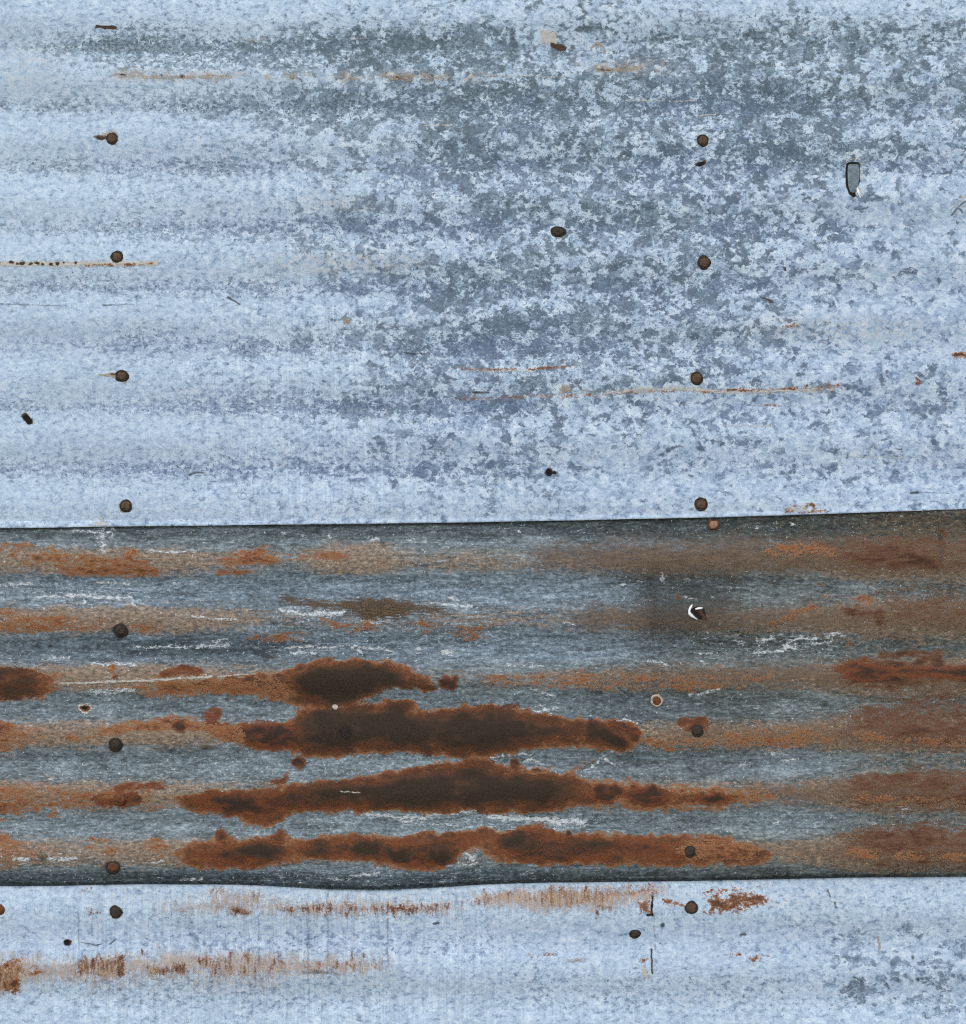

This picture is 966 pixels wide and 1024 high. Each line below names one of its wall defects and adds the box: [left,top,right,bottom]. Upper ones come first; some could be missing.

rust [0,260,159,268]
rust [0,540,199,607]
rust [215,535,348,577]
rust [752,527,966,574]
rust [0,583,966,881]
rust [163,883,685,918]
rust [702,885,773,915]
rust [0,949,377,995]